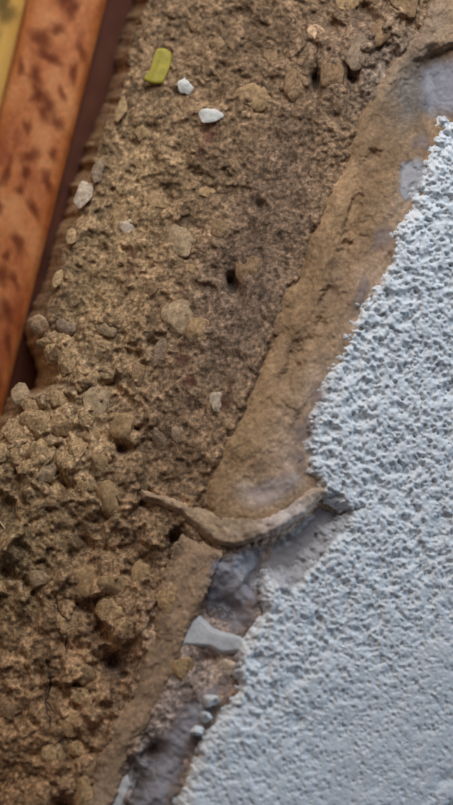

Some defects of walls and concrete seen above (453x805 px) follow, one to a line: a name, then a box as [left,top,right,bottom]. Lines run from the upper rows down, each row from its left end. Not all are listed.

flaking render [198,108,224,123]
spalling [73,181,93,209]
peeling [205,0,453,521]
spalling [160,299,194,338]
spalling [11,382,30,406]
spalling [19,410,53,438]
spalling [109,412,135,441]
spalling [66,437,88,458]
spalling [96,480,119,518]
peeling [141,486,327,548]
peeling [243,509,353,598]
peeling [88,534,263,805]